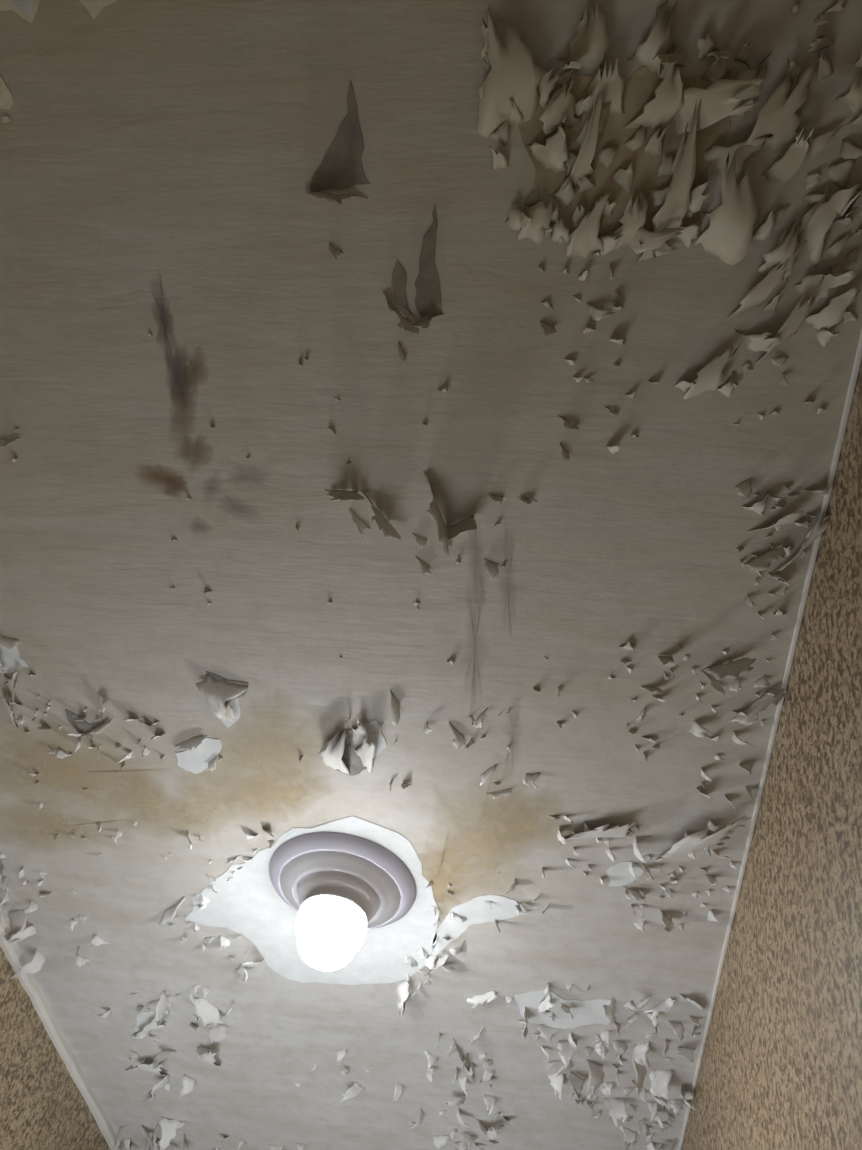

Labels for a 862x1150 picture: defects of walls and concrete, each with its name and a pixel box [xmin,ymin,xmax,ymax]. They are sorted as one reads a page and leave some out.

peeling [304,81,370,204]
peeling [477,0,862,399]
peeling [383,206,444,366]
peeling [0,634,249,774]
peeling [318,689,400,776]
peeling [627,644,786,761]
peeling [550,768,752,932]
peeling [0,868,51,979]
peeling [159,816,549,1019]
peeling [114,1117,188,1150]
peeling [124,984,234,1102]
peeling [408,1026,515,1150]